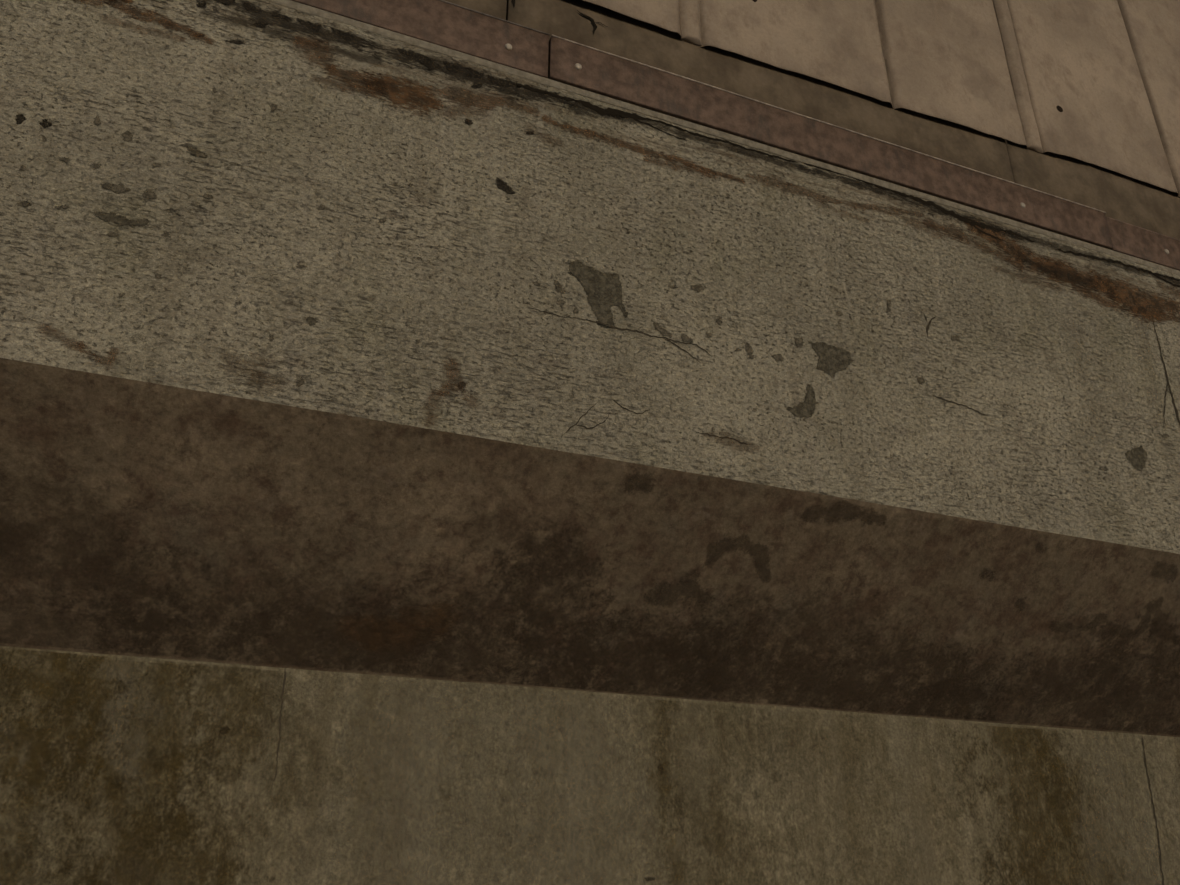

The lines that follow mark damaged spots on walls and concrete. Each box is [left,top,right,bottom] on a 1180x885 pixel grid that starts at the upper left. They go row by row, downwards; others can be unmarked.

rust [74,0,215,45]
rust [295,36,745,183]
spalling [554,260,628,328]
crack [517,83,1180,424]
rust [965,220,1180,323]
spalling [795,337,853,378]
crack [564,398,650,434]
crack [693,431,750,445]
spalling [786,384,816,417]
spalling [1125,445,1147,472]
crack [1142,737,1164,885]